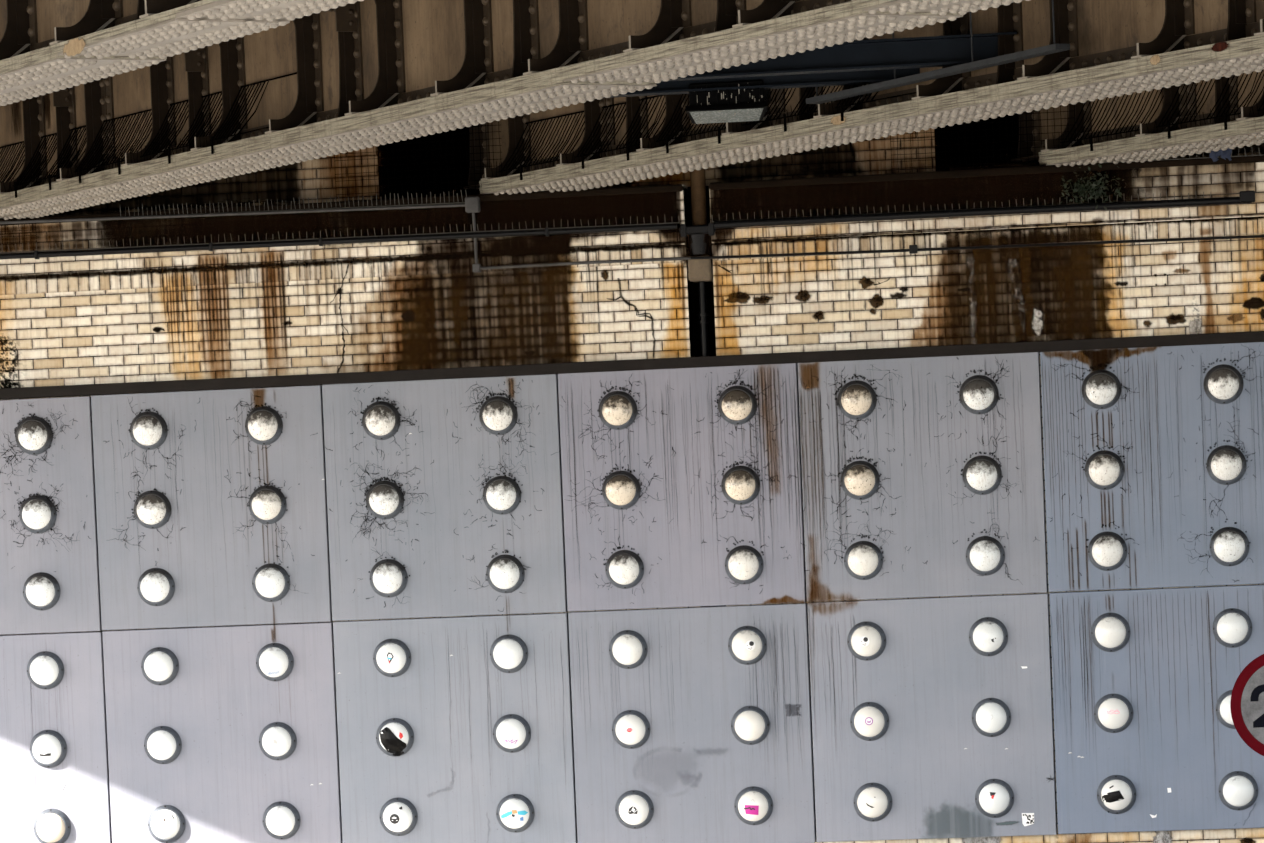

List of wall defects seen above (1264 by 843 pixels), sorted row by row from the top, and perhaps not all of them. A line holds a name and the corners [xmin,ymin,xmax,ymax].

leakage [0,336,21,388]
crack [607,278,655,358]
leakage [0,142,1264,370]
rust [673,264,685,315]
rust [754,372,781,464]
rust [801,366,823,522]